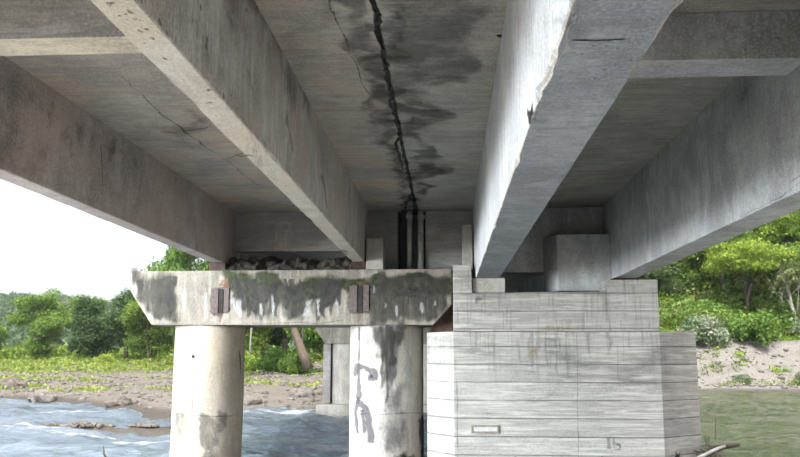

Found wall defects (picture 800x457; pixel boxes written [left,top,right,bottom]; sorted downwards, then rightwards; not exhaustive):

crack [369,0,415,210]
water stain [131,267,182,322]
water stain [229,278,341,321]
water stain [365,272,450,406]
water stain [199,411,226,457]
water stain [386,422,405,451]